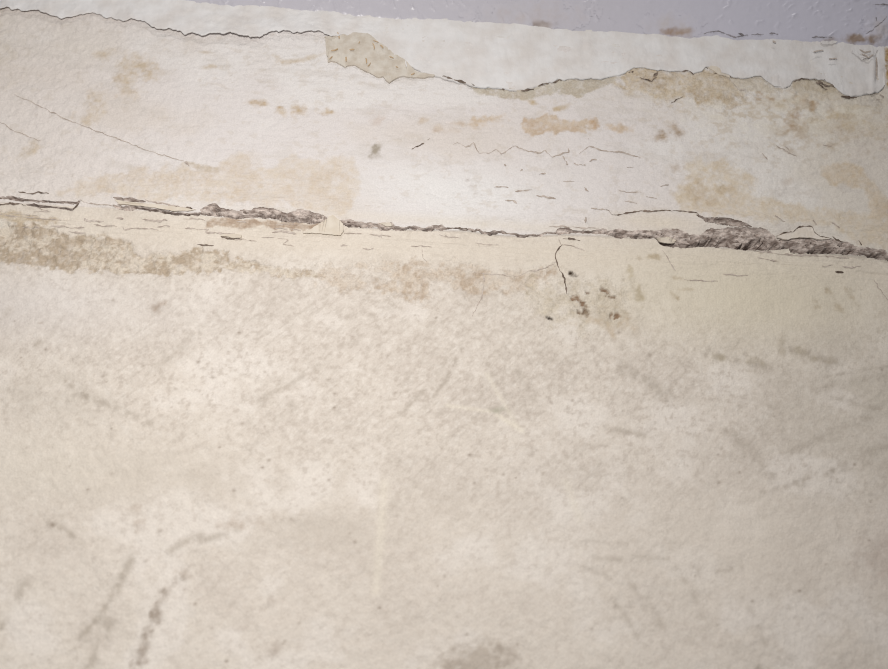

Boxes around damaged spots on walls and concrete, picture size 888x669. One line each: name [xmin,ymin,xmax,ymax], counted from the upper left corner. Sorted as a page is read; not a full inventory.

peeling [0,0,885,115]
crack [16,95,189,166]
crack [0,138,888,316]
damp [561,252,680,341]